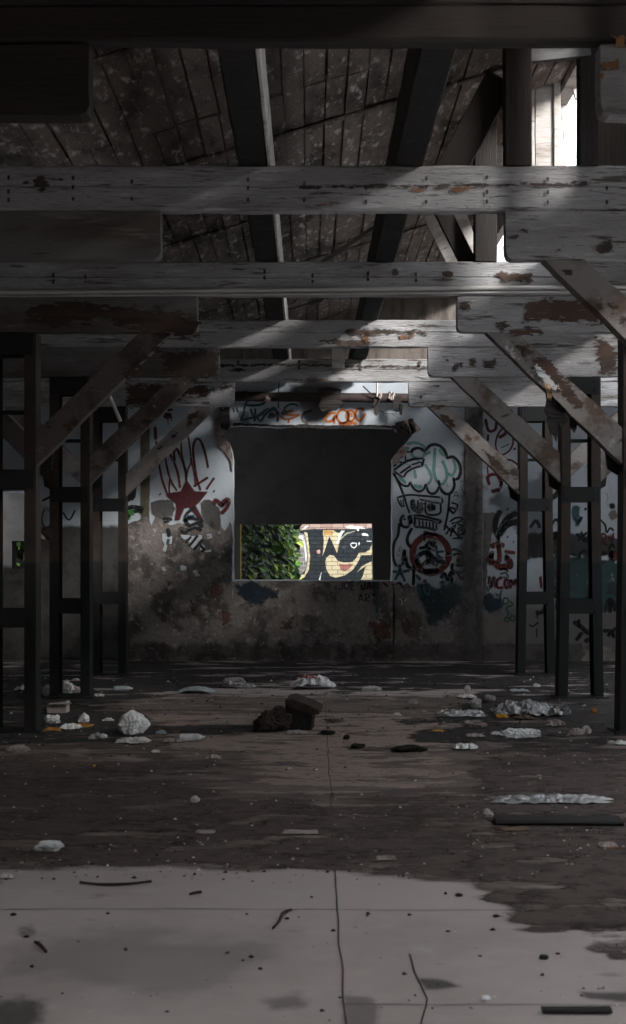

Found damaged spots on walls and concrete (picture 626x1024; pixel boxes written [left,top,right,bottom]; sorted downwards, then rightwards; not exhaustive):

peeling [299,181,588,192]
peeling [444,297,619,411]
flaking render [128,499,465,661]
crack [409,954,428,1024]